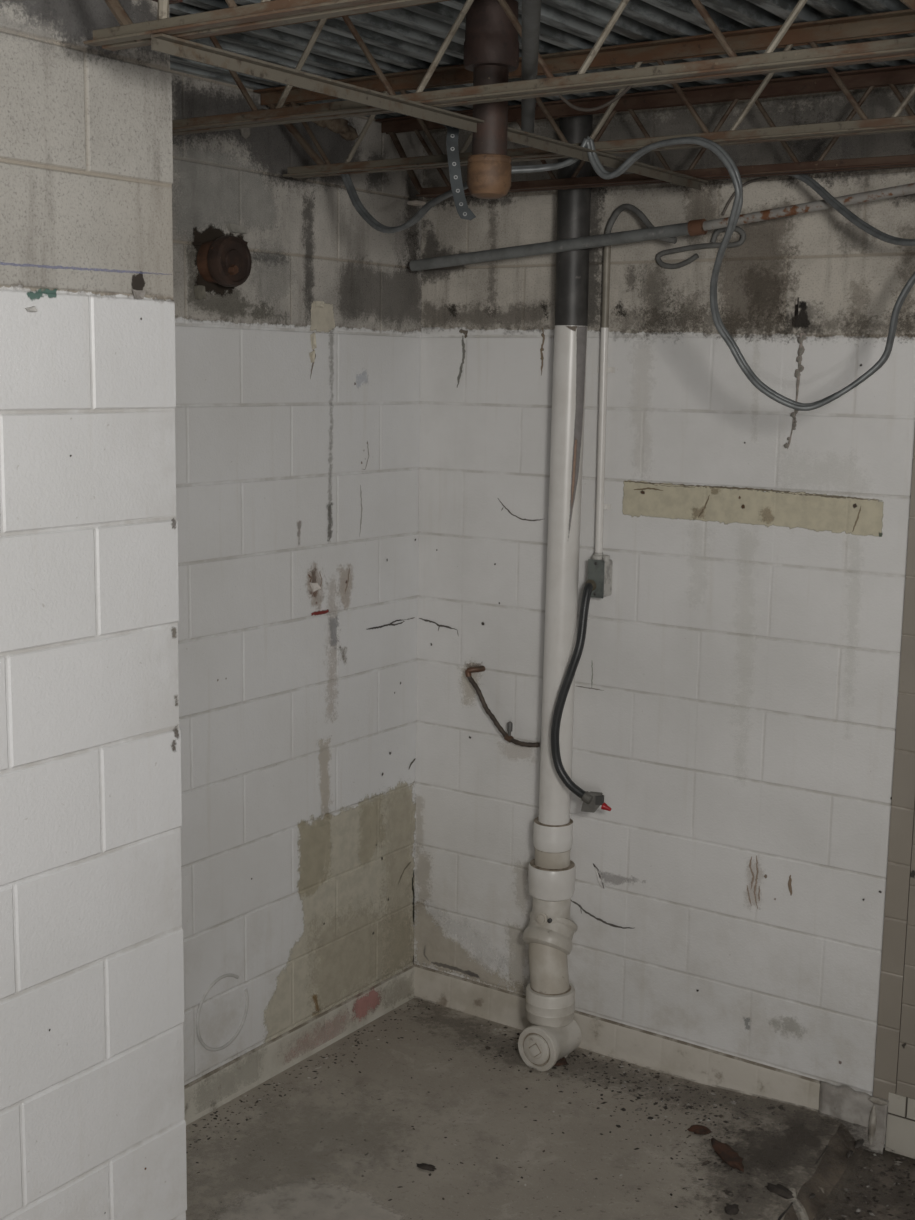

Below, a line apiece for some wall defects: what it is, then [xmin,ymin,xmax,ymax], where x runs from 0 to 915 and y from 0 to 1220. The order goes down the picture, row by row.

water stain [177,121,359,187]
water stain [421,222,464,283]